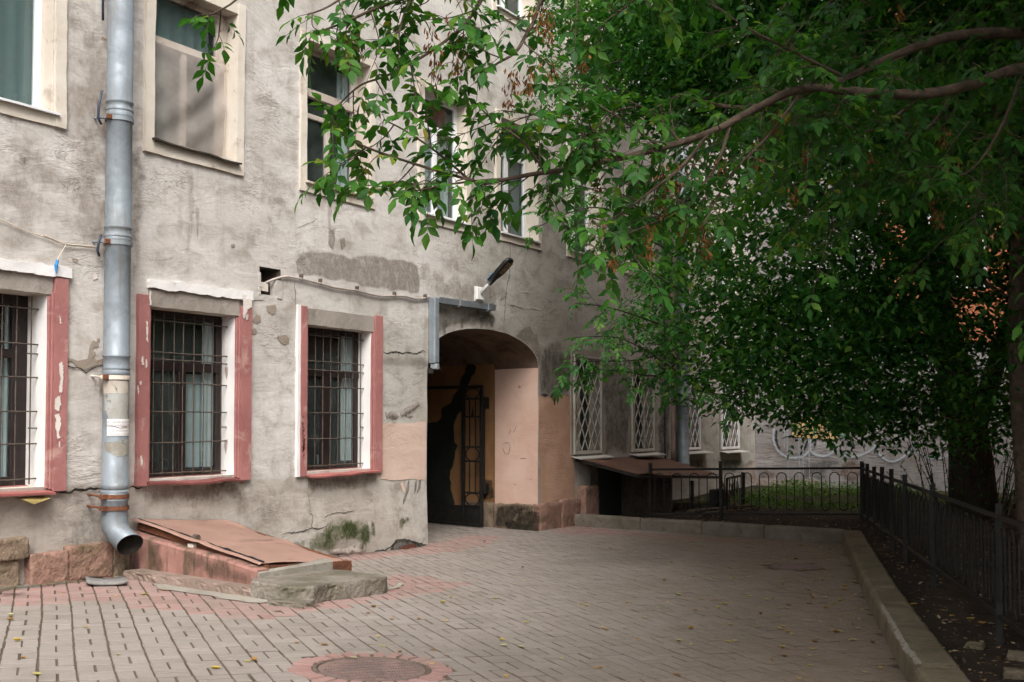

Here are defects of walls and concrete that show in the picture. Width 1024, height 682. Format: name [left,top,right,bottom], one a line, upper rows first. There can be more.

spalling [242,266,282,334]
flaking render [55,338,103,447]
crack [284,482,352,534]